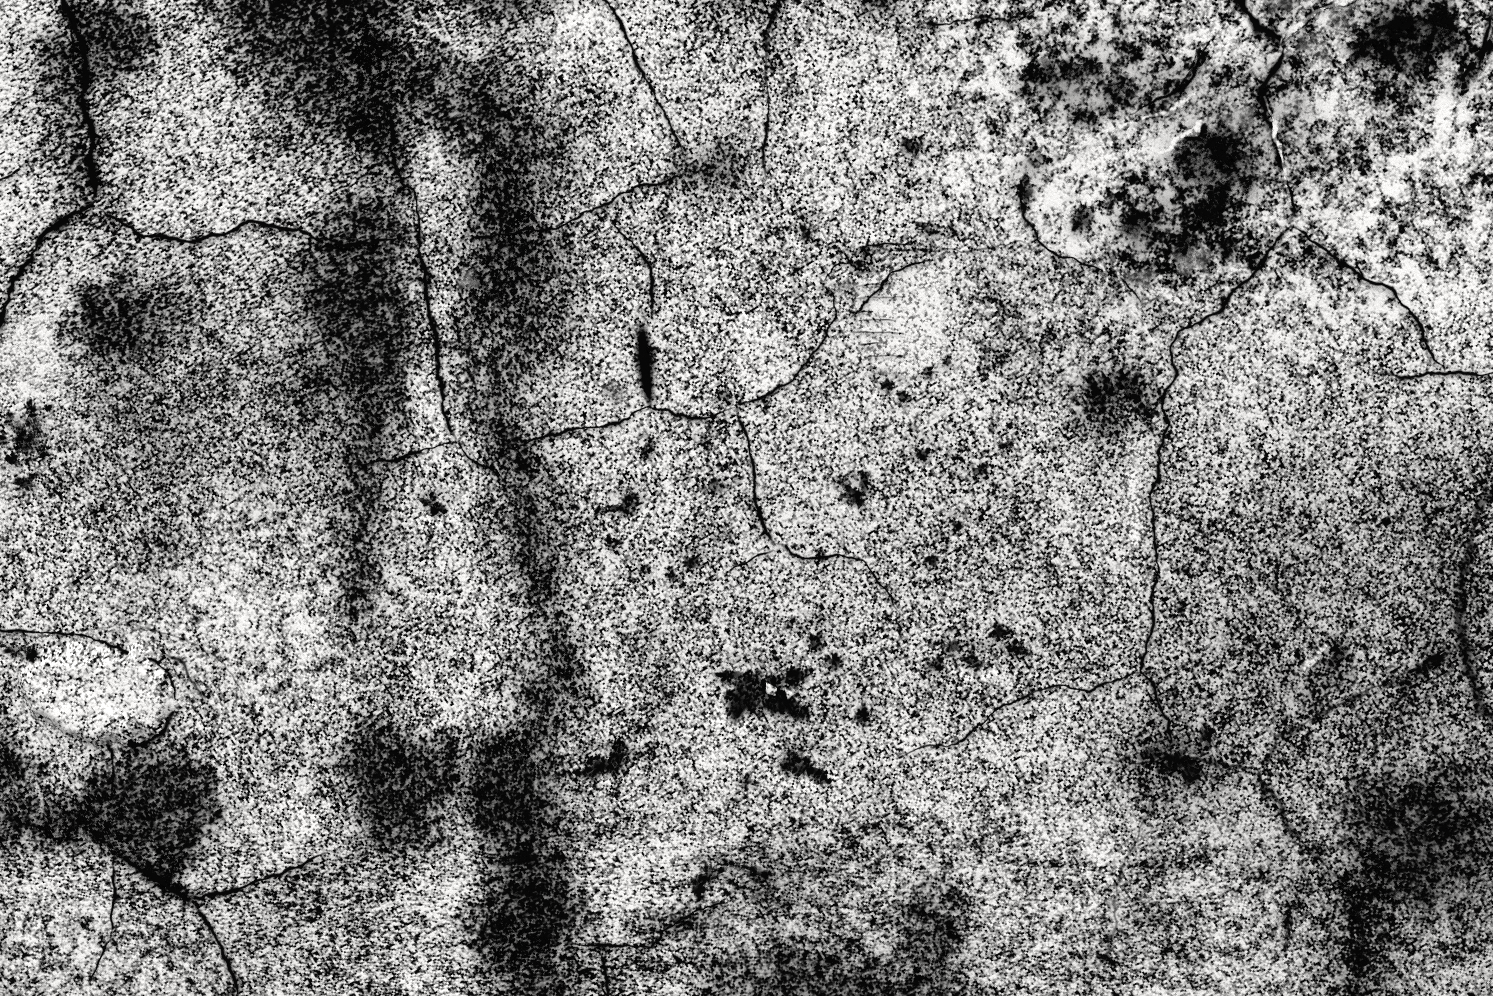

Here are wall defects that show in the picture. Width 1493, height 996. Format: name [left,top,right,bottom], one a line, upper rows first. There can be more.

peeling [1264,0,1493,96]
peeling [1007,0,1315,320]
water stain [0,253,193,392]
crack [0,0,1143,612]
water stain [0,456,15,543]
water stain [37,0,600,996]
crack [899,0,1493,996]
crack [0,621,241,802]
water stain [0,707,223,913]
crack [89,852,328,996]
crack [564,899,733,996]
water stain [637,873,997,996]